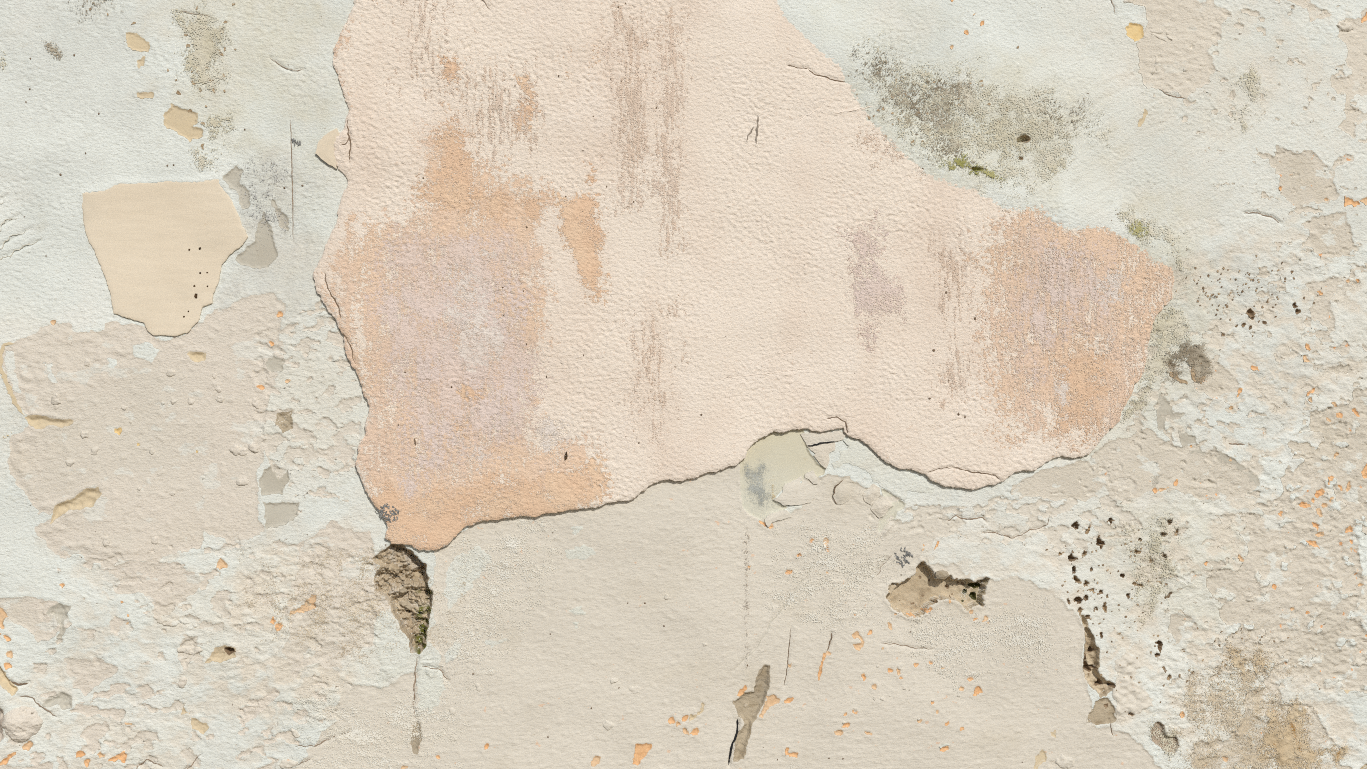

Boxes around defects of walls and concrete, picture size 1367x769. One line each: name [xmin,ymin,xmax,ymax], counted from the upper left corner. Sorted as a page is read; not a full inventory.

leakage [833,32,1213,458]
flaking render [1068,550,1108,598]
spalling [177,634,248,670]
peeling [0,596,215,769]
peeling [237,687,310,736]
peeling [235,723,300,769]